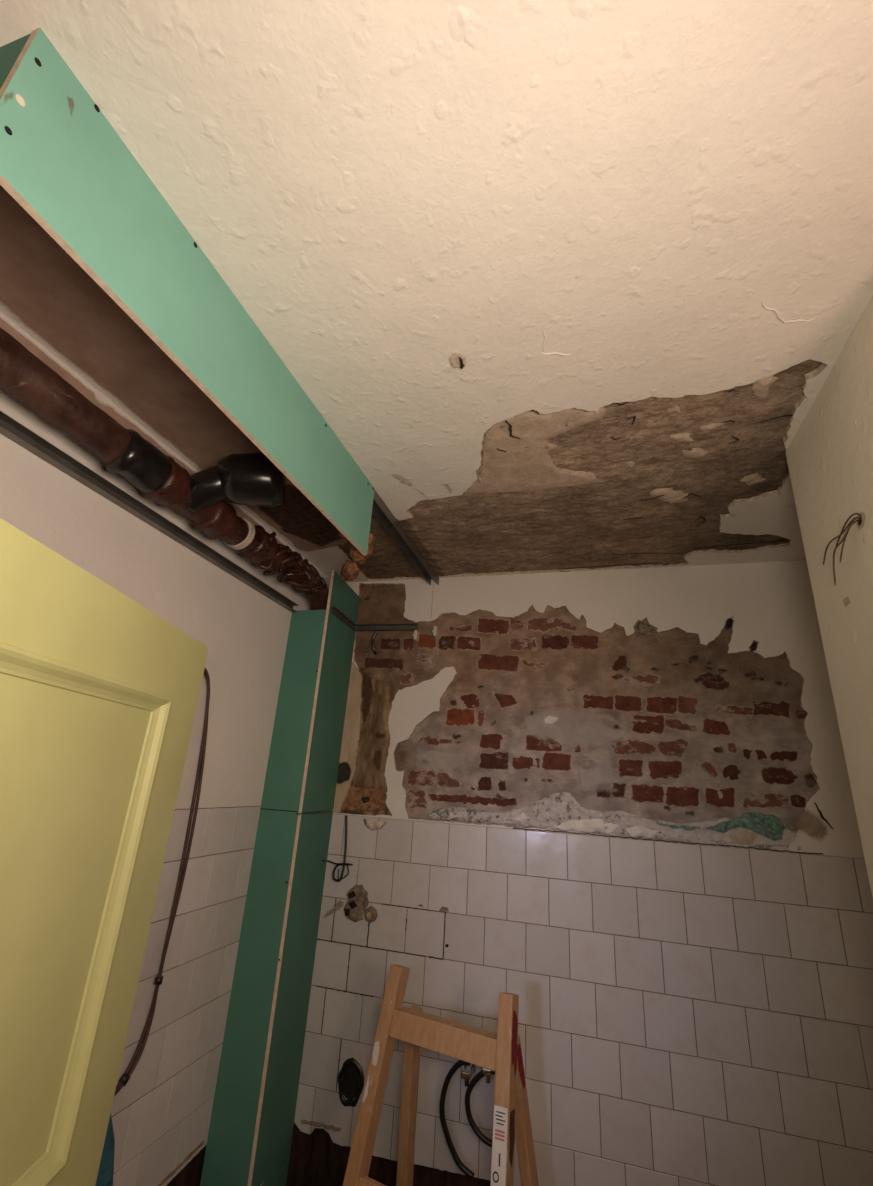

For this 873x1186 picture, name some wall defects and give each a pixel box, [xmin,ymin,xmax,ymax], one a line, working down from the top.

flaking render [449,352,467,369]
flaking render [669,417,732,458]
flaking render [650,488,689,505]
flaking render [740,473,766,486]
flaking render [337,584,819,845]
leakage [429,792,826,850]
spalling [344,884,369,922]